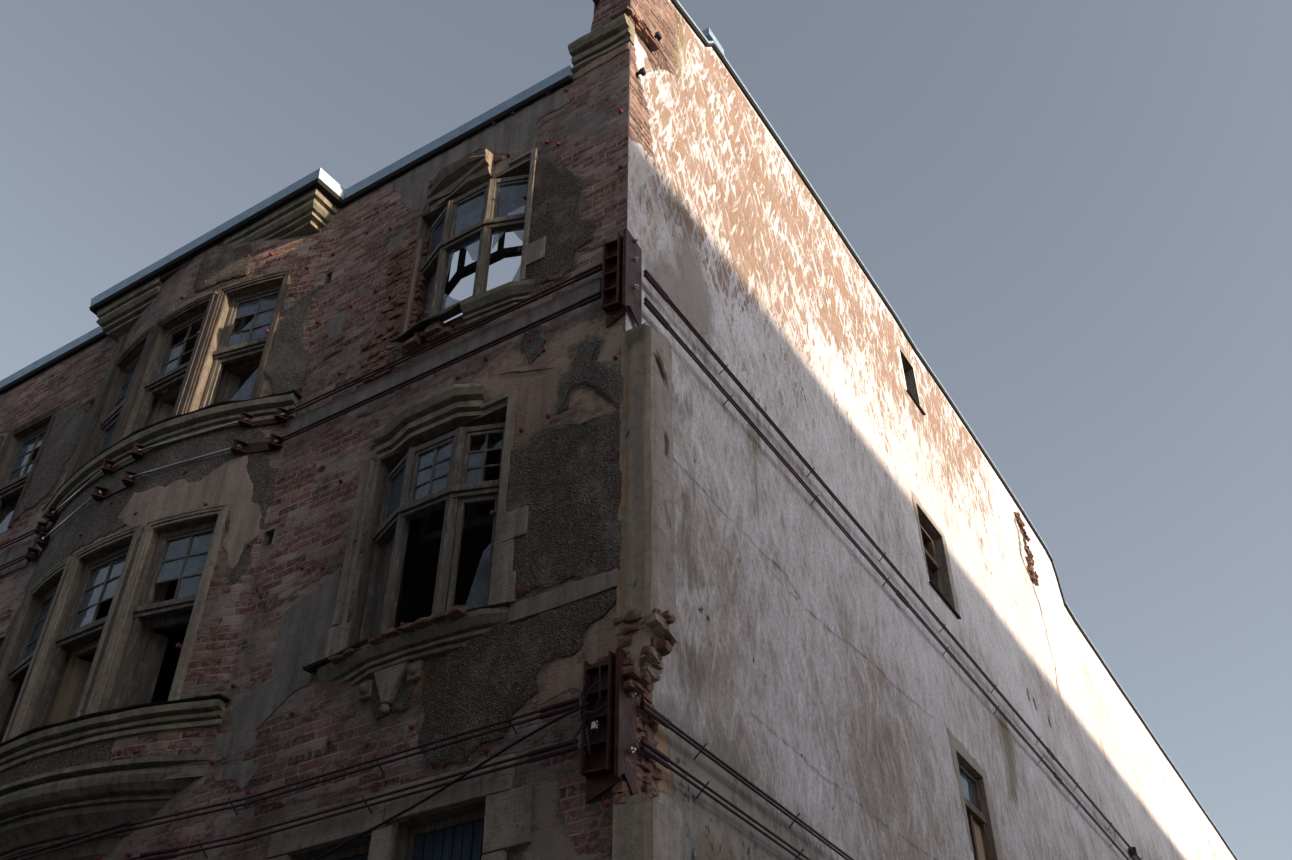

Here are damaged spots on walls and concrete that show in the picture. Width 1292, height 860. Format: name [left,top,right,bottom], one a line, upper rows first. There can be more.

peeling [556,0,1039,586]
peeling [118,413,391,616]
peeling [531,608,818,860]
crack [1032,582,1061,701]